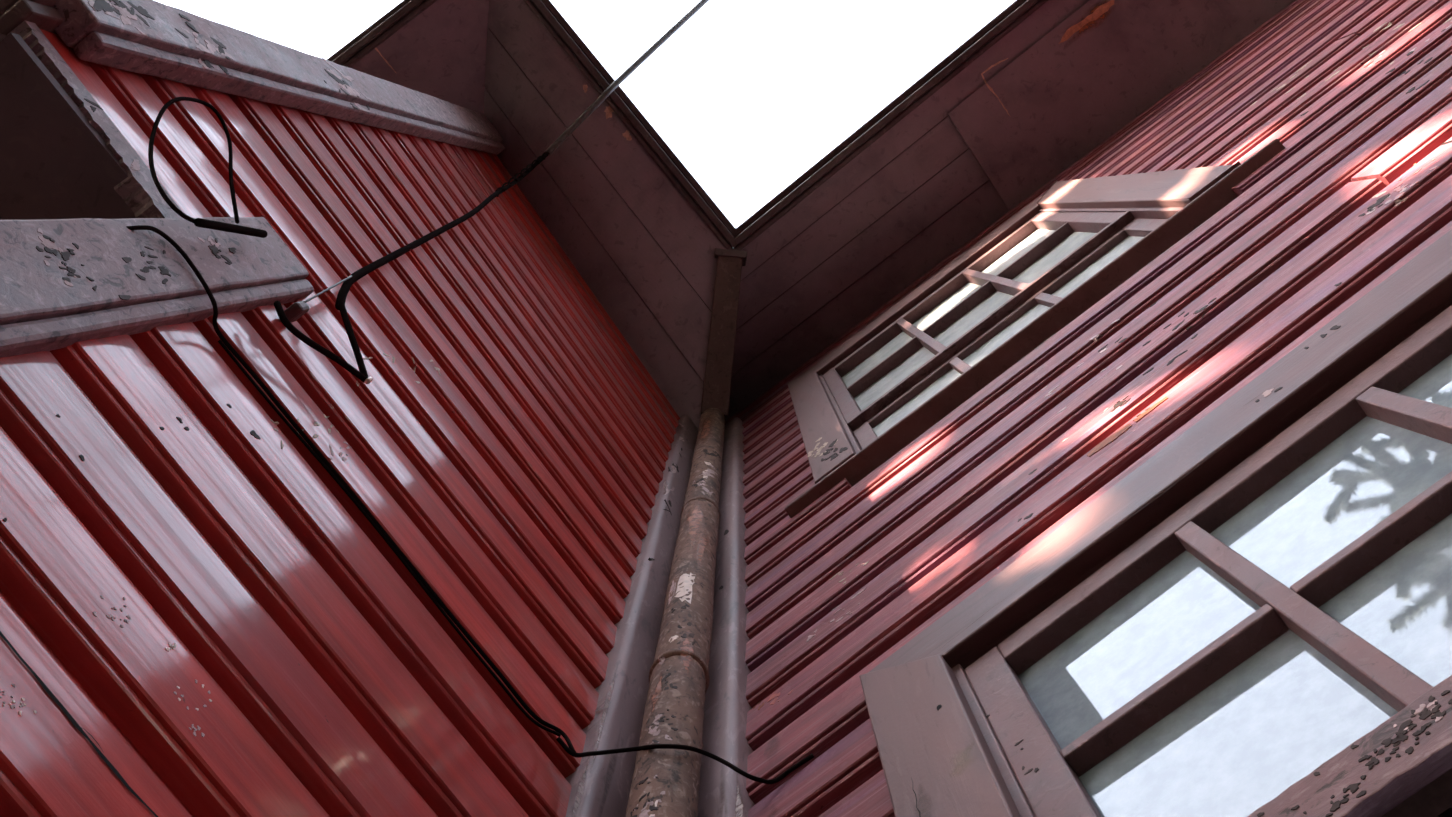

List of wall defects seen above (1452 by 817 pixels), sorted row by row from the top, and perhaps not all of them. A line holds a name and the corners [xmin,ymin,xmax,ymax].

peeling [88,0,155,35]
peeling [175,13,234,75]
peeling [322,58,372,112]
peeling [36,228,97,291]
peeling [122,246,171,284]
peeling [198,236,236,265]
peeling [663,423,719,515]
peeling [658,573,695,690]
peeling [646,709,678,743]
peeling [1325,690,1452,817]
peeling [630,775,665,817]